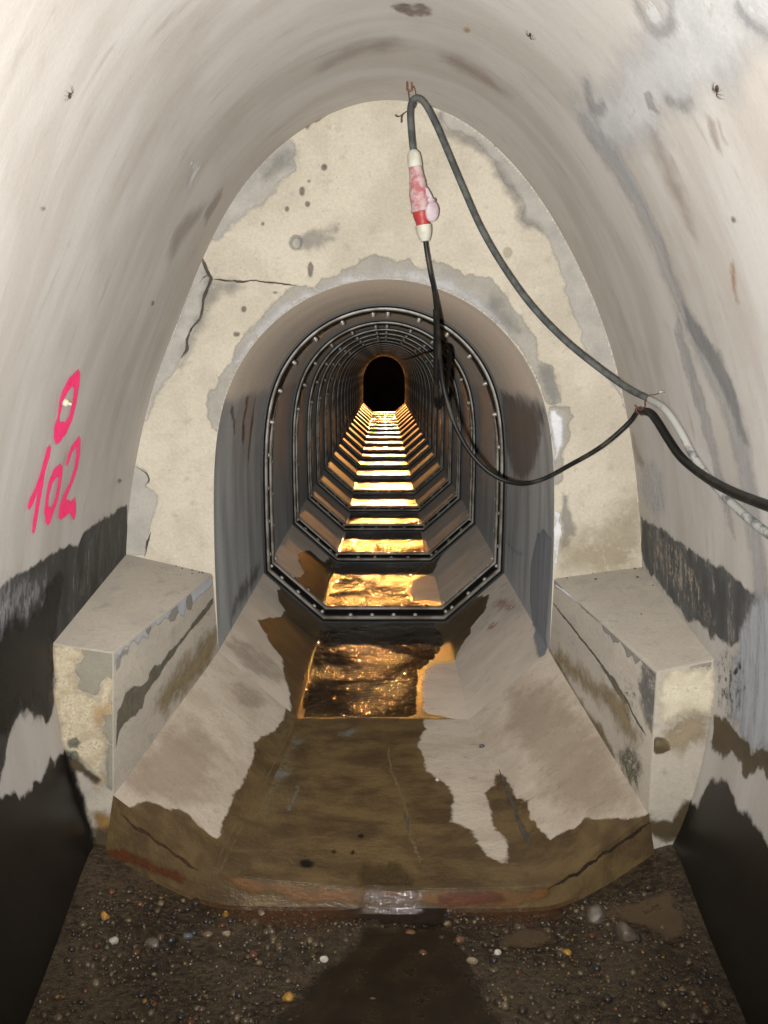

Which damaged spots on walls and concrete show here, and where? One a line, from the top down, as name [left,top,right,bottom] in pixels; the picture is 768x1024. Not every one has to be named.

crack [181,259,296,358]
damp [575,0,768,596]
damp [294,413,443,606]
spalling [53,646,112,788]
crack [121,814,197,870]
damp [0,587,768,1024]
crack [548,822,650,890]
spalling [554,581,715,721]
spalling [654,737,670,754]